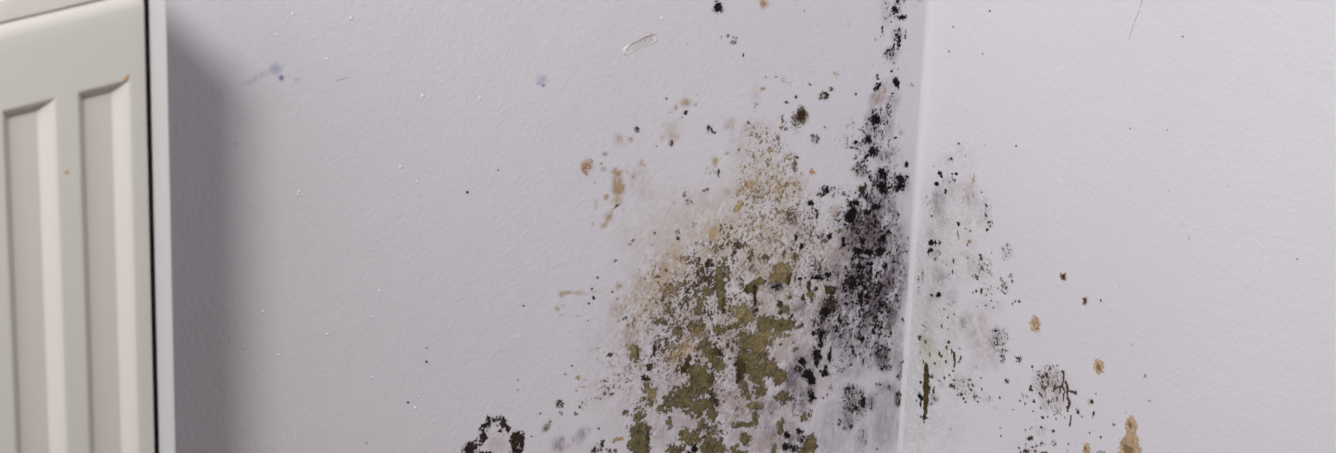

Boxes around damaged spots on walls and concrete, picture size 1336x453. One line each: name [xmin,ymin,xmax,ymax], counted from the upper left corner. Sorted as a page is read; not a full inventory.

water stain [462,0,1142,453]